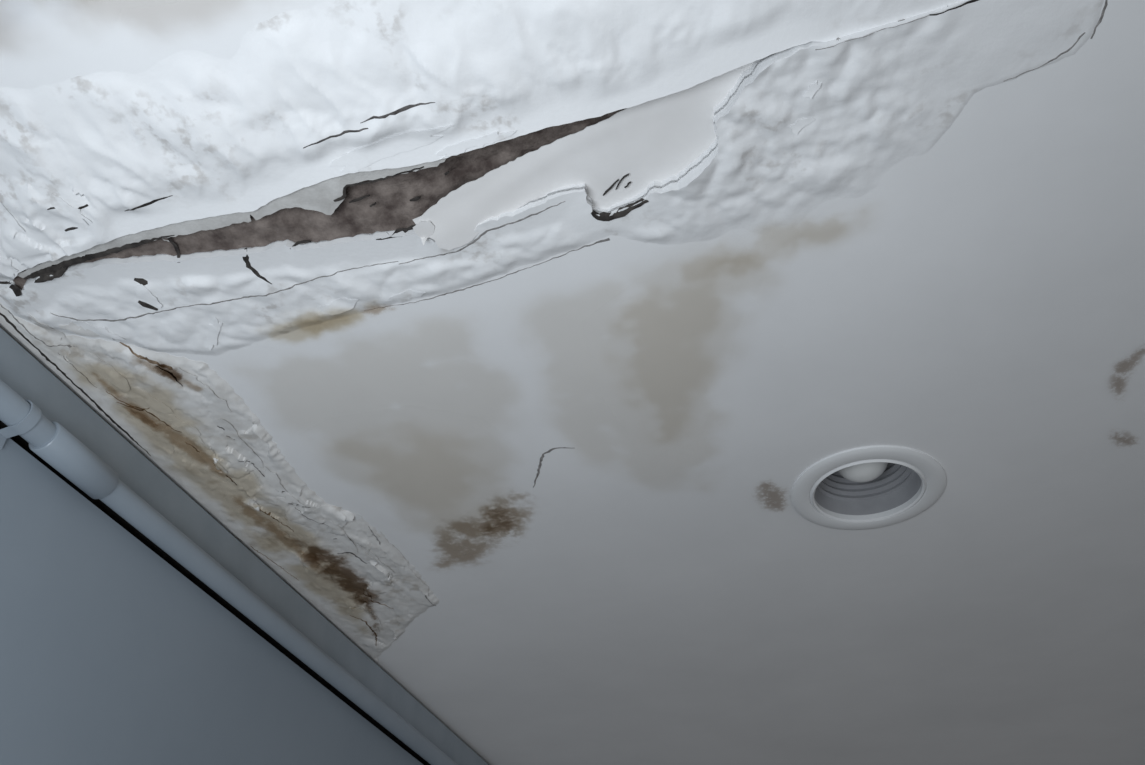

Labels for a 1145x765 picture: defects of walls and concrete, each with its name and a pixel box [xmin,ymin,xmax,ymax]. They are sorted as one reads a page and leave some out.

crack [815,0,979,50]
crack [1003,0,1107,82]
flaking render [75,108,626,265]
crack [603,173,631,196]
flaking render [13,263,57,290]
damp [308,547,375,609]